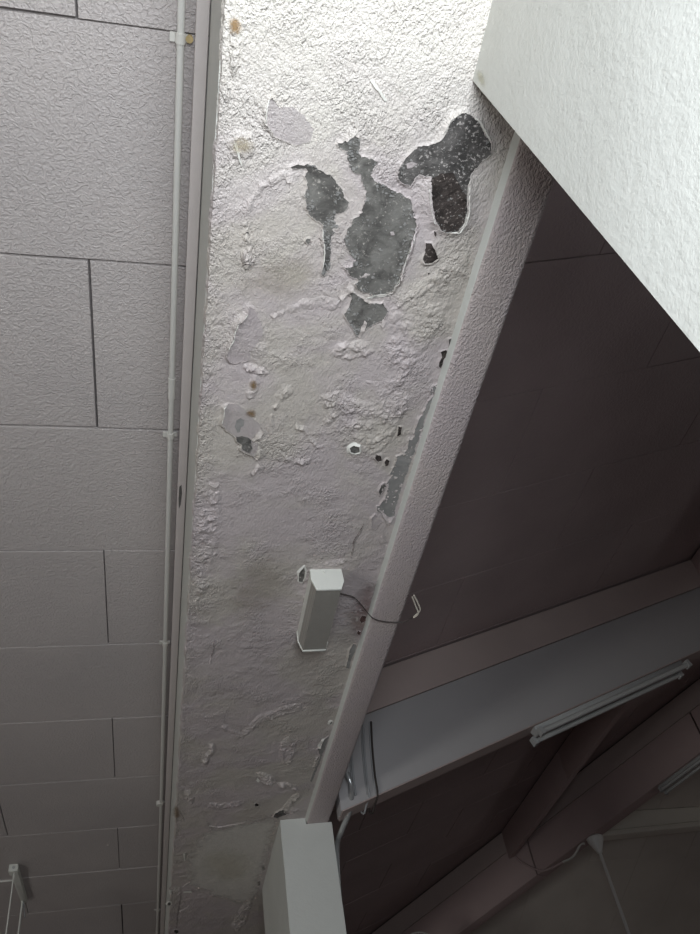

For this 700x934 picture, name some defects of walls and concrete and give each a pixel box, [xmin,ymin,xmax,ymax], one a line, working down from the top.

peeling [258,93,316,147]
flaking render [285,106,496,338]
peeling [222,302,269,374]
flaking render [435,337,452,369]
peeling [217,402,265,476]
flaking render [347,442,362,455]
flaking render [368,383,437,548]
flaking render [310,736,329,782]